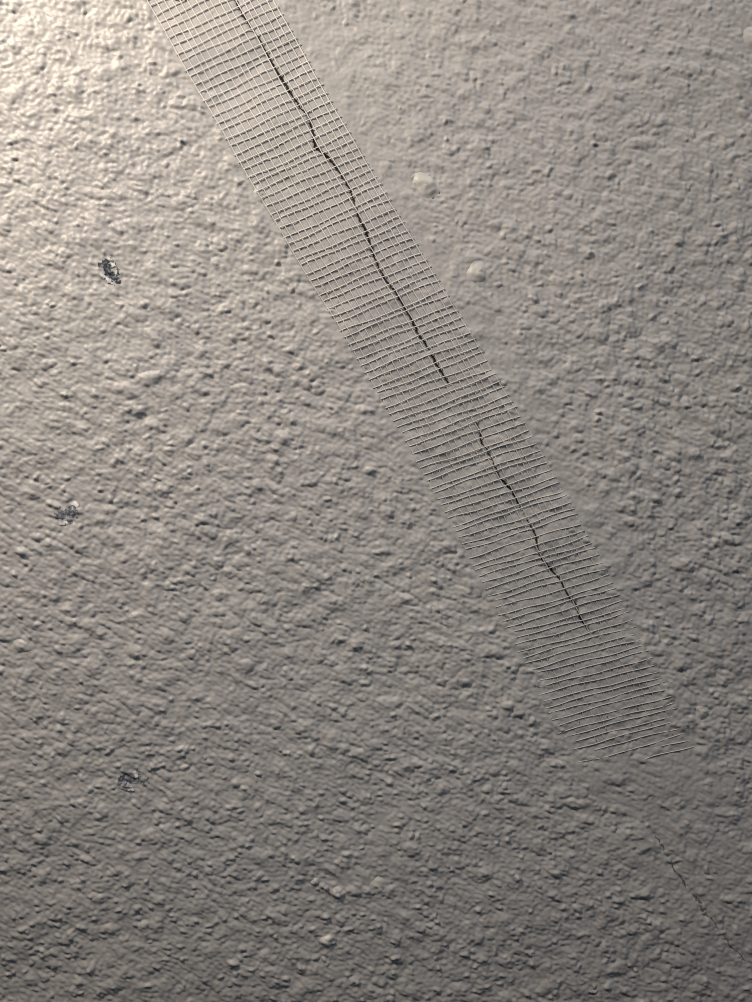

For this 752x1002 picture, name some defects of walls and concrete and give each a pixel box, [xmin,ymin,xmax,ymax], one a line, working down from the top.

crack [235,1,449,384]
crack [476,422,585,625]